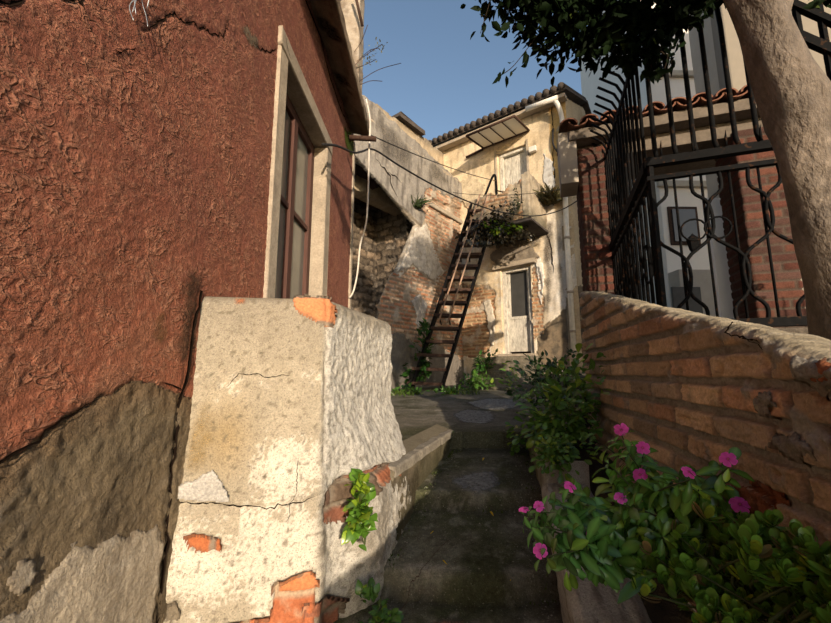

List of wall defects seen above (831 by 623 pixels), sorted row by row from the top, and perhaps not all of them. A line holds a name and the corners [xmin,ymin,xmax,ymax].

crack [0,0,23,8]
crack [113,11,229,54]
spalling [375,188,496,359]
spalling [293,293,338,328]
crack [724,322,763,350]
peeling [0,381,229,623]
crack [156,290,320,623]
spalling [323,475,359,524]
spalling [362,461,401,496]
spalling [240,571,350,623]